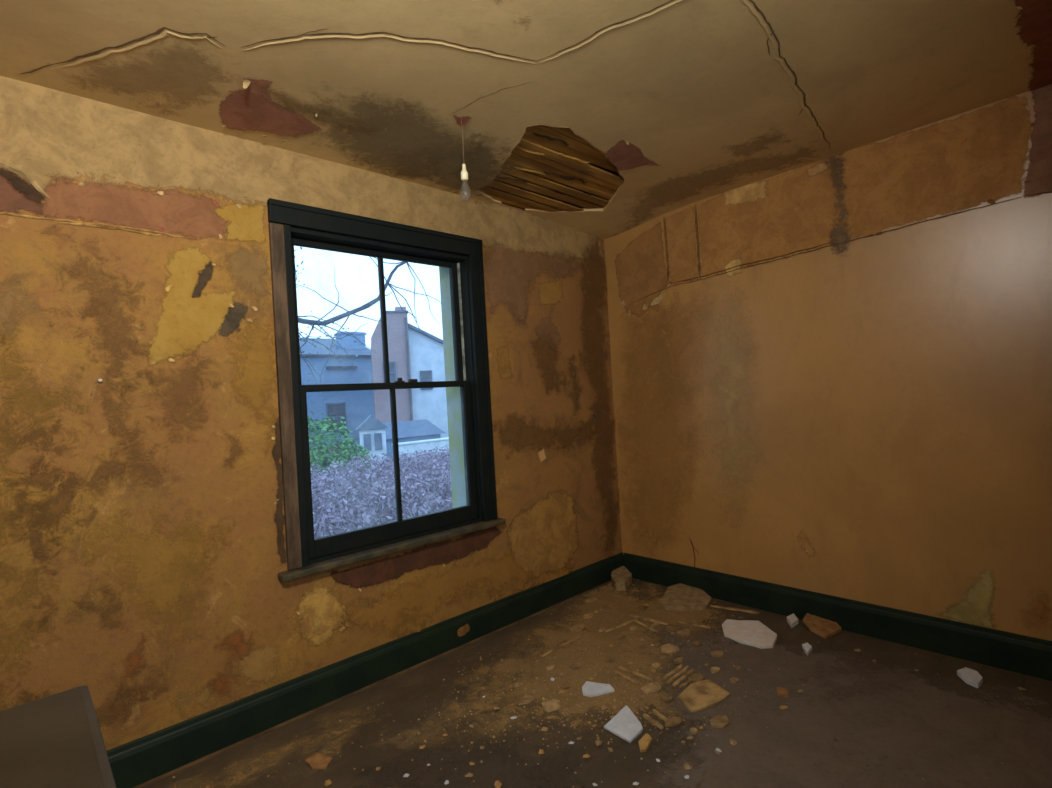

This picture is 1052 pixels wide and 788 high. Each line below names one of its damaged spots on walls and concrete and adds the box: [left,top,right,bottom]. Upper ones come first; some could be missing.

peeling [0,76,660,349]
crack [22,0,685,114]
water stain [322,98,508,196]
crack [741,0,831,151]
peeling [1012,0,1052,91]
water stain [10,247,217,568]
water stain [493,237,619,550]
spalling [328,526,501,592]